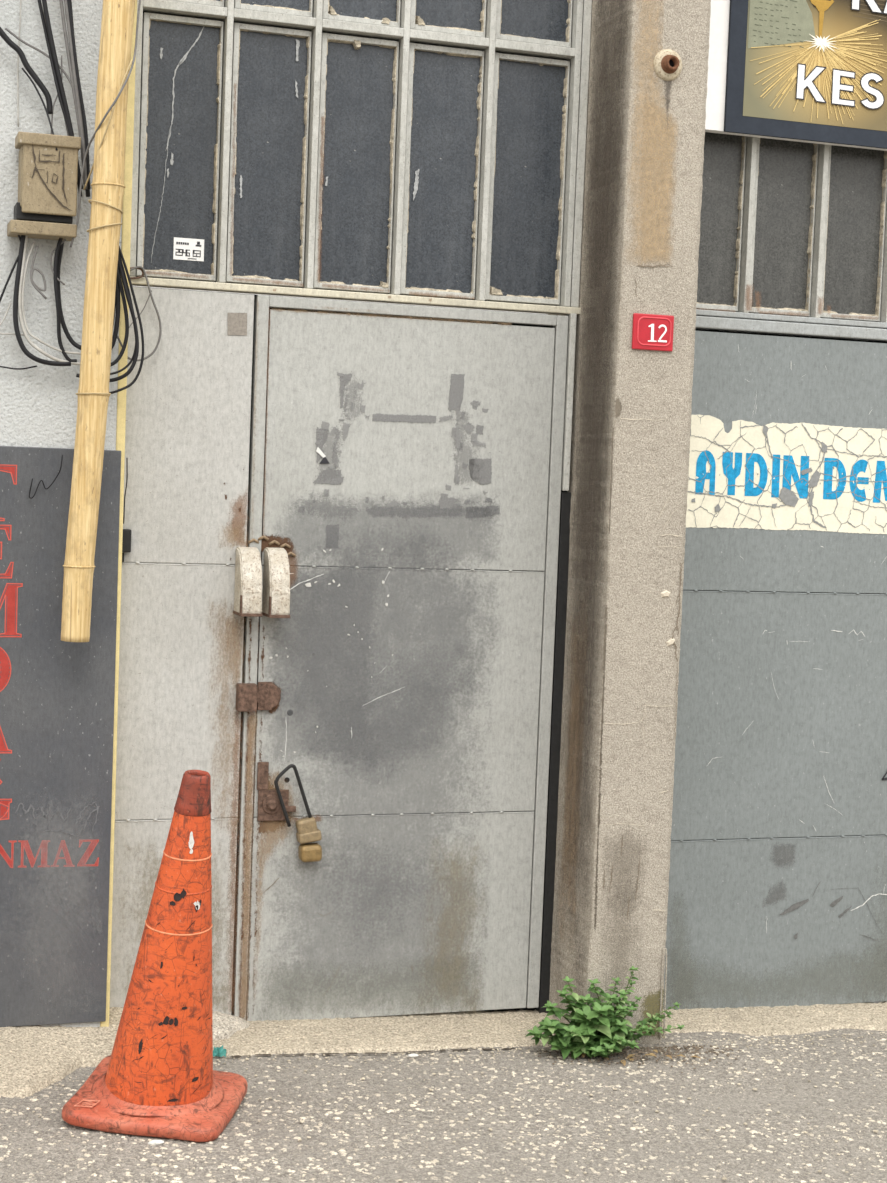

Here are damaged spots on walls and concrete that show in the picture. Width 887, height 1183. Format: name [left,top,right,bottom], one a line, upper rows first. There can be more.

peeling [298,373,500,519]
corrosion [224,483,246,539]
corrosion [261,534,295,581]
peeling [323,524,339,553]
corrosion [231,595,291,1017]